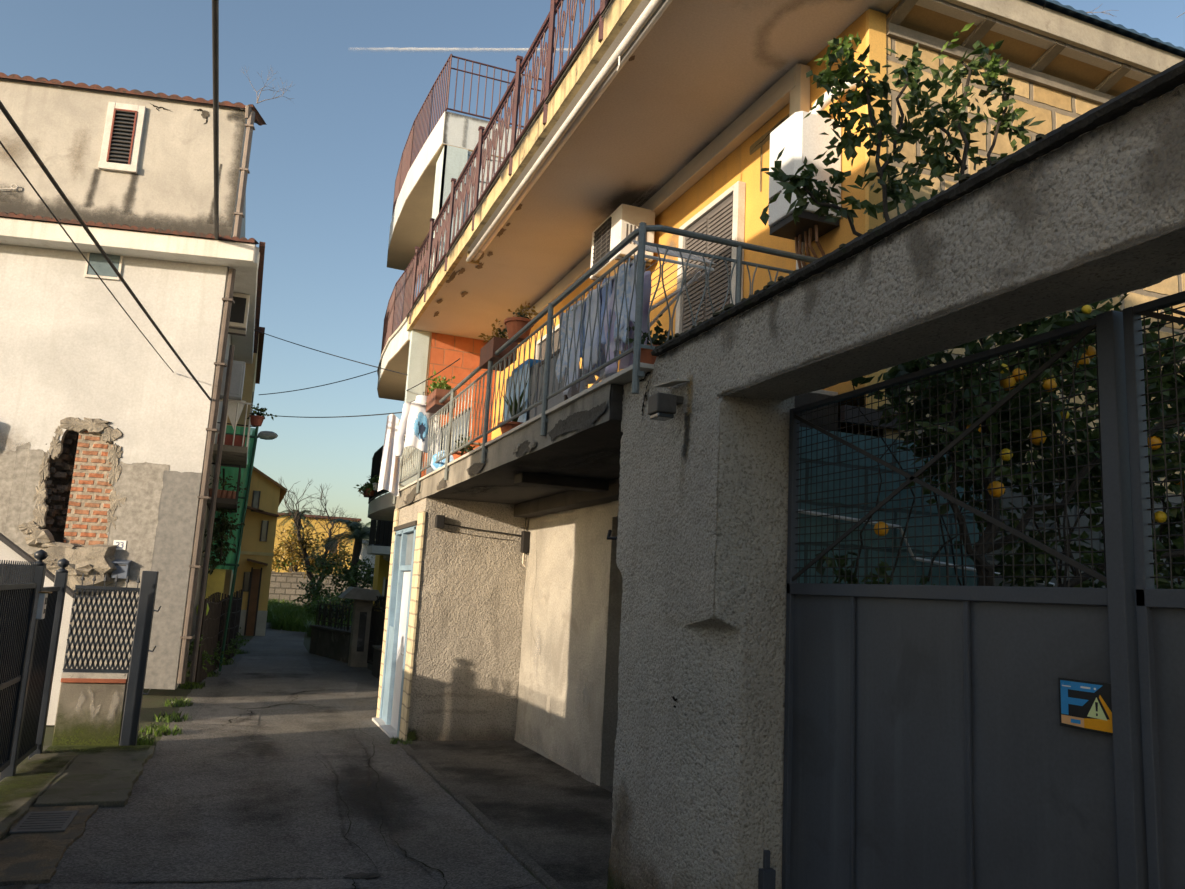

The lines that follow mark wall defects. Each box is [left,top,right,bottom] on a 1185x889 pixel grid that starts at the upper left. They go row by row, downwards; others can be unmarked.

damp [0,110,245,237]
spalling [513,402,606,457]
peeling [0,417,170,669]